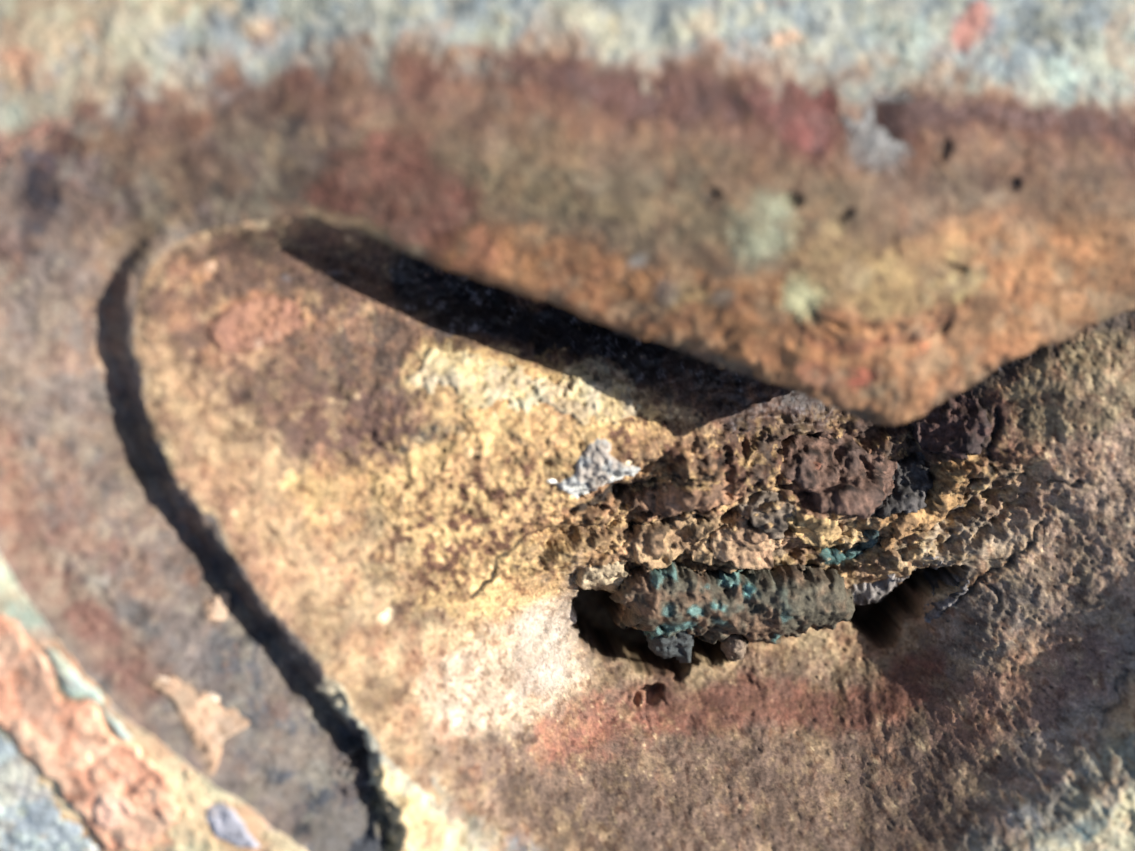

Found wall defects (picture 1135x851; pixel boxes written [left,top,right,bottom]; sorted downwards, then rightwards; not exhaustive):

rust [553,66,840,156]
water stain [842,90,910,168]
rust [885,96,1100,134]
water stain [746,200,792,256]
water stain [786,284,817,315]
water stain [821,529,880,565]
water stain [525,615,566,691]
peeling [44,645,132,741]
peeling [0,734,99,851]
peeling [206,803,260,848]